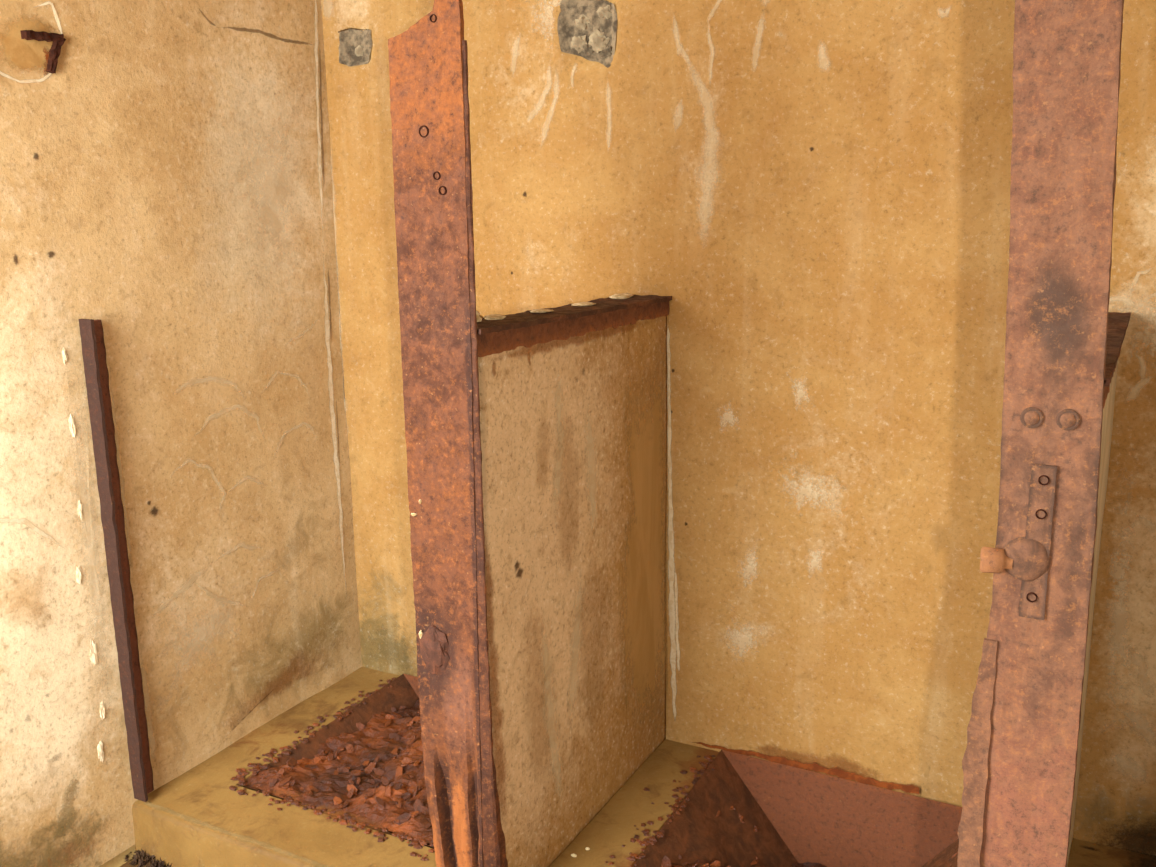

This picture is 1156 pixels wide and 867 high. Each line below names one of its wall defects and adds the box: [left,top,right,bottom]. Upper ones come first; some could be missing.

crack [200,11,324,178]
water stain [695,34,718,232]
crack [326,272,334,339]
water stain [0,819,99,867]